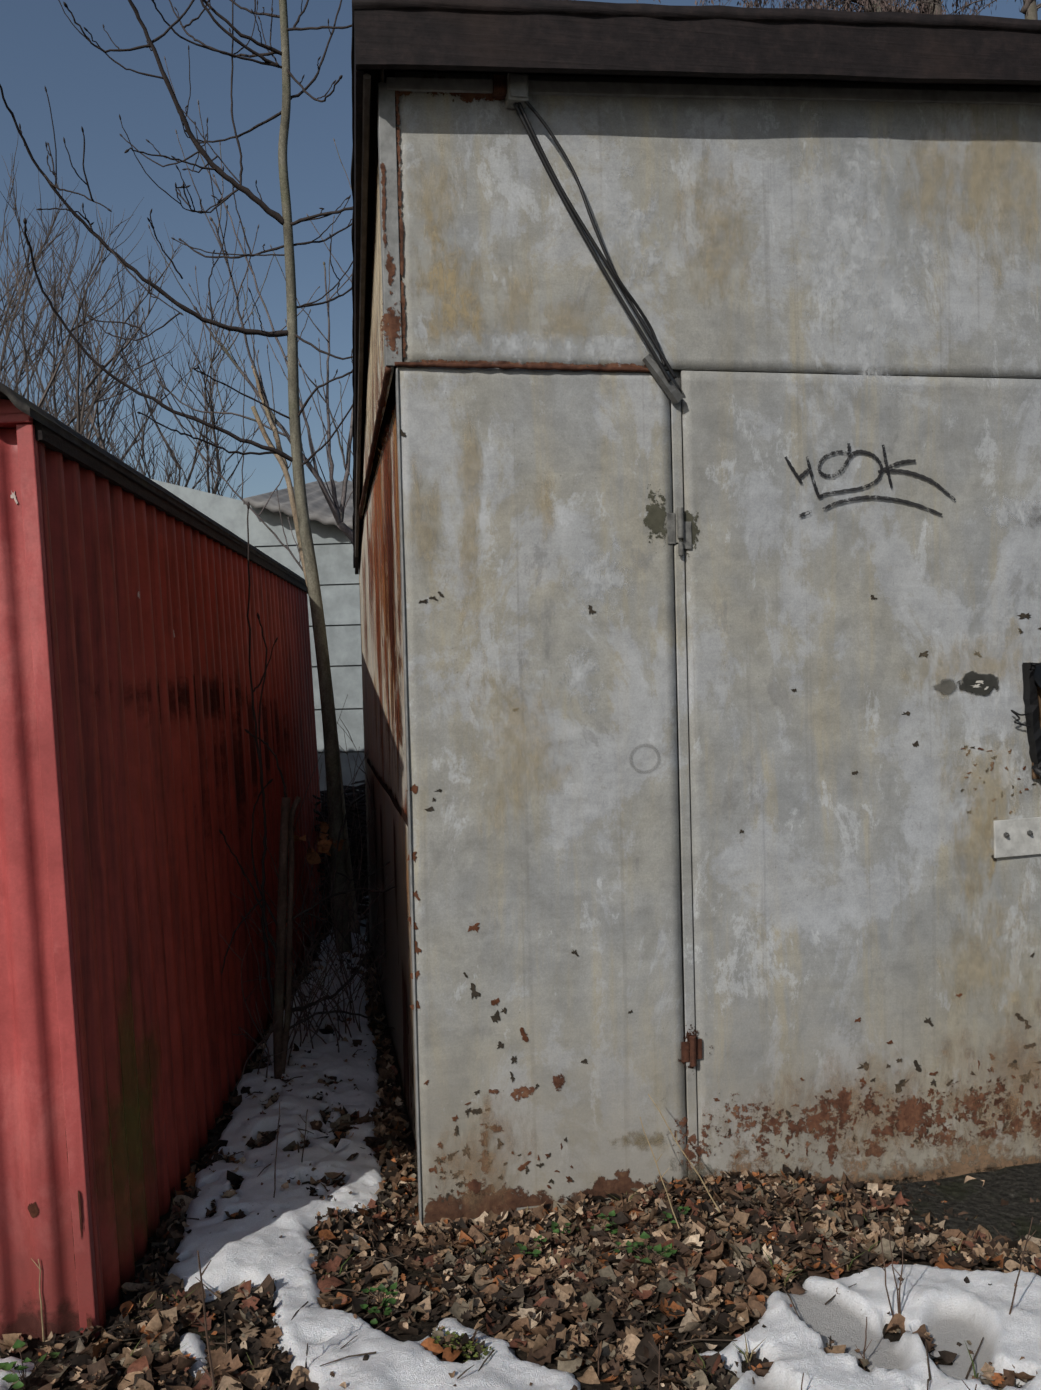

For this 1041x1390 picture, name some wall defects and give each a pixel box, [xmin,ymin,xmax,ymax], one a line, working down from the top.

peeling [643,484,700,555]
corrosion [362,75,647,1149]
peeling [463,972,507,1022]
corrosion [678,1024,713,1069]
peeling [886,1040,953,1093]
peeling [989,1013,1041,1084]
peeling [429,1090,490,1179]
corrosion [670,1061,1041,1185]